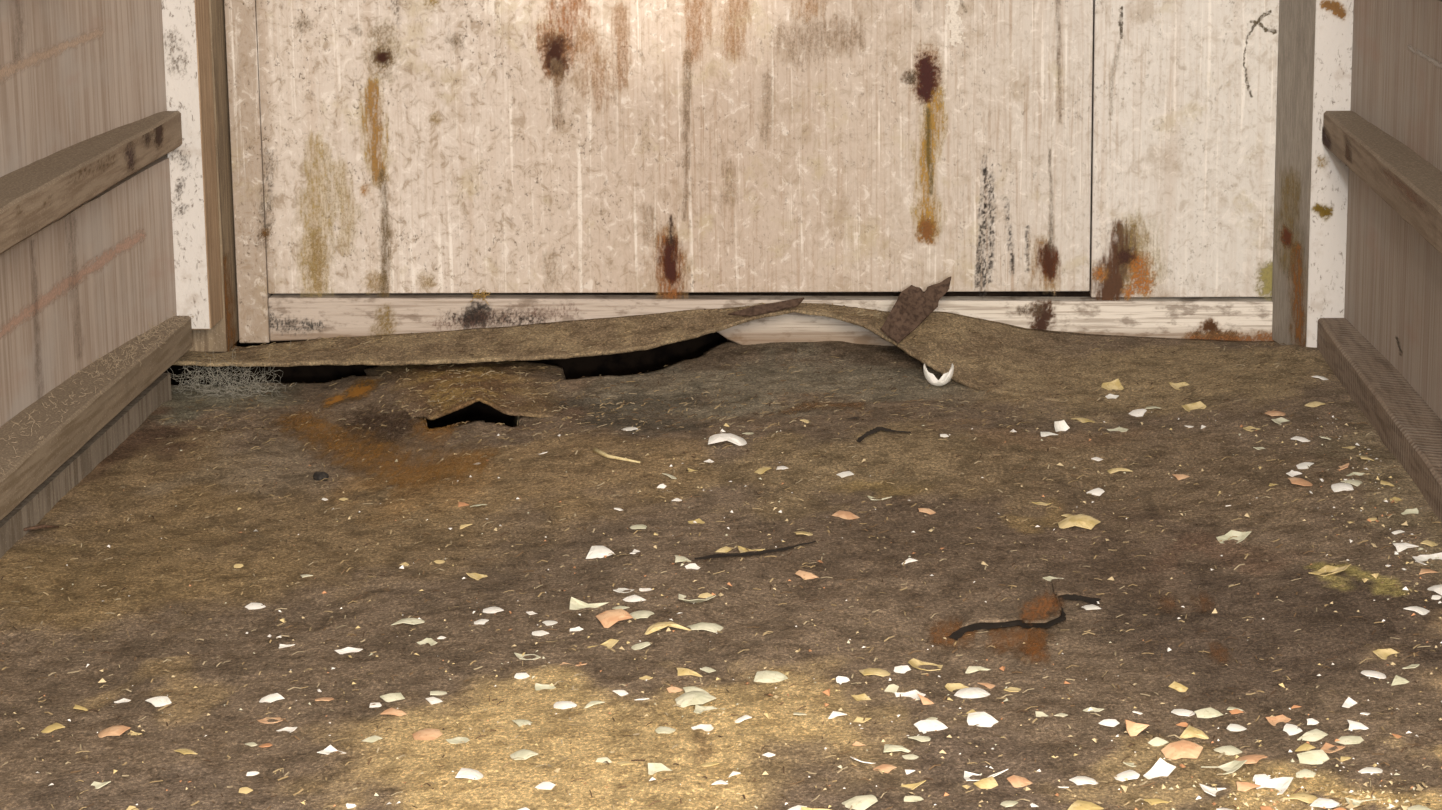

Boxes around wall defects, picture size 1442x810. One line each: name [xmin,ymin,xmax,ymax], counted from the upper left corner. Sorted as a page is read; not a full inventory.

corrosion [537,0,590,128]
corrosion [901,48,947,244]
corrosion [655,215,687,299]
corrosion [1017,221,1059,330]
corrosion [1093,218,1156,301]
crack [948,577,1101,641]